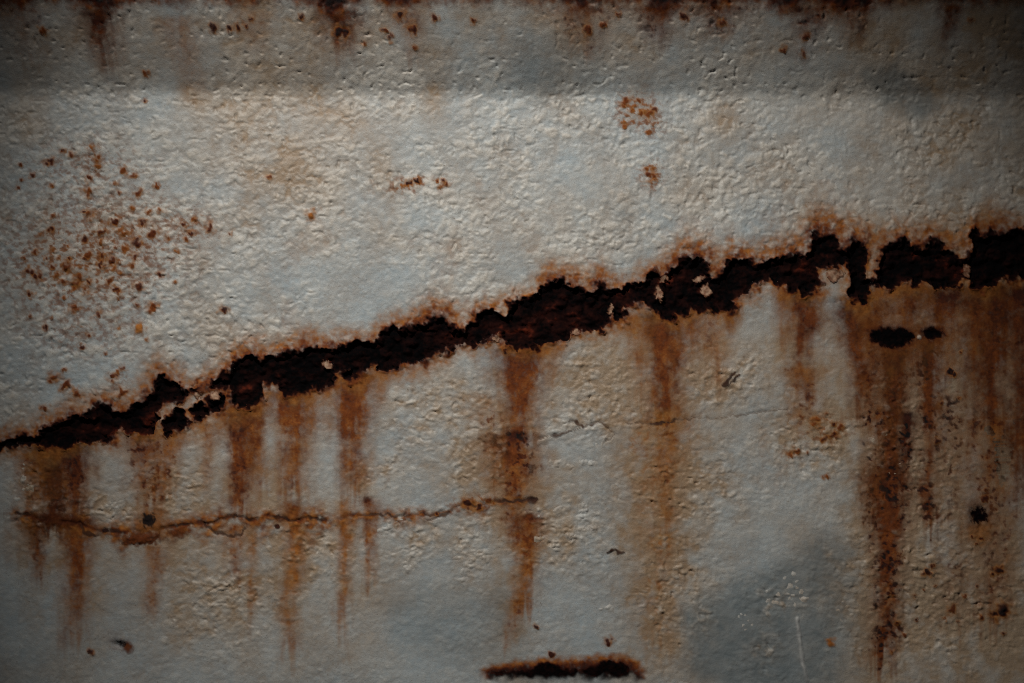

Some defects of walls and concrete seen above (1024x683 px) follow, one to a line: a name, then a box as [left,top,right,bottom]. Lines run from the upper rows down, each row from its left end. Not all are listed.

corrosion [294,0,366,45]
corrosion [526,0,903,57]
corrosion [20,167,212,341]
corrosion [22,444,92,616]
corrosion [203,390,314,595]
crack [13,497,538,551]
corrosion [336,372,382,563]
corrosion [462,343,550,626]
corrosion [630,308,696,516]
corrosion [777,289,844,442]
corrosion [838,283,1024,674]
corrosion [483,638,644,680]